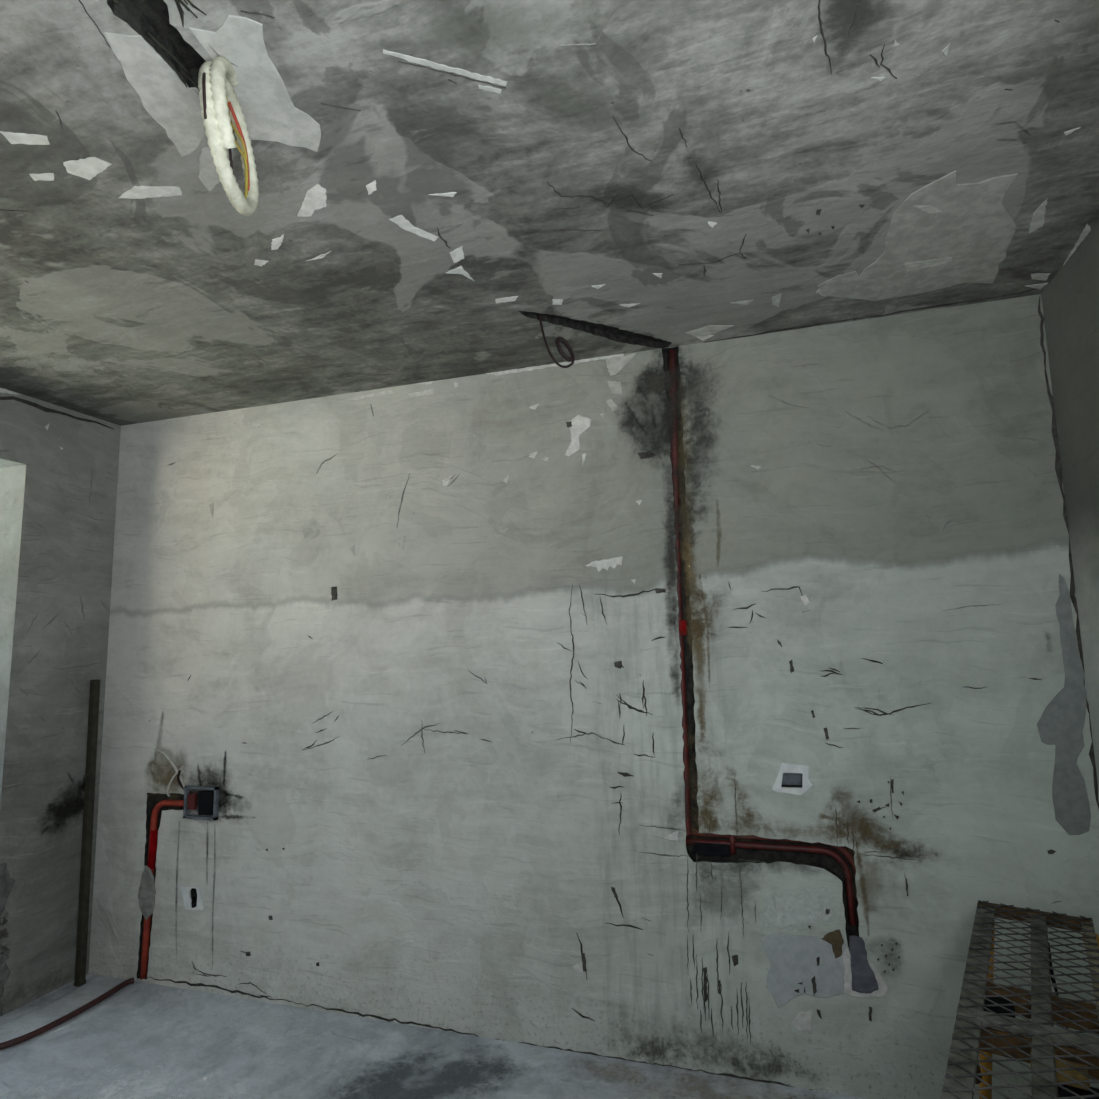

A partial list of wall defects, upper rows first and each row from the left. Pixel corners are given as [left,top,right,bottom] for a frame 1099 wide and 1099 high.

crack [79,0,111,48]
crack [241,10,275,19]
damp [818,0,880,74]
crack [0,396,113,429]
damp [622,364,680,456]
crack [704,288,1099,809]
damp [189,751,240,818]
crack [303,711,340,750]
crack [370,720,491,759]
crack [557,584,770,936]
damp [687,933,751,1043]
damp [339,1053,513,1099]